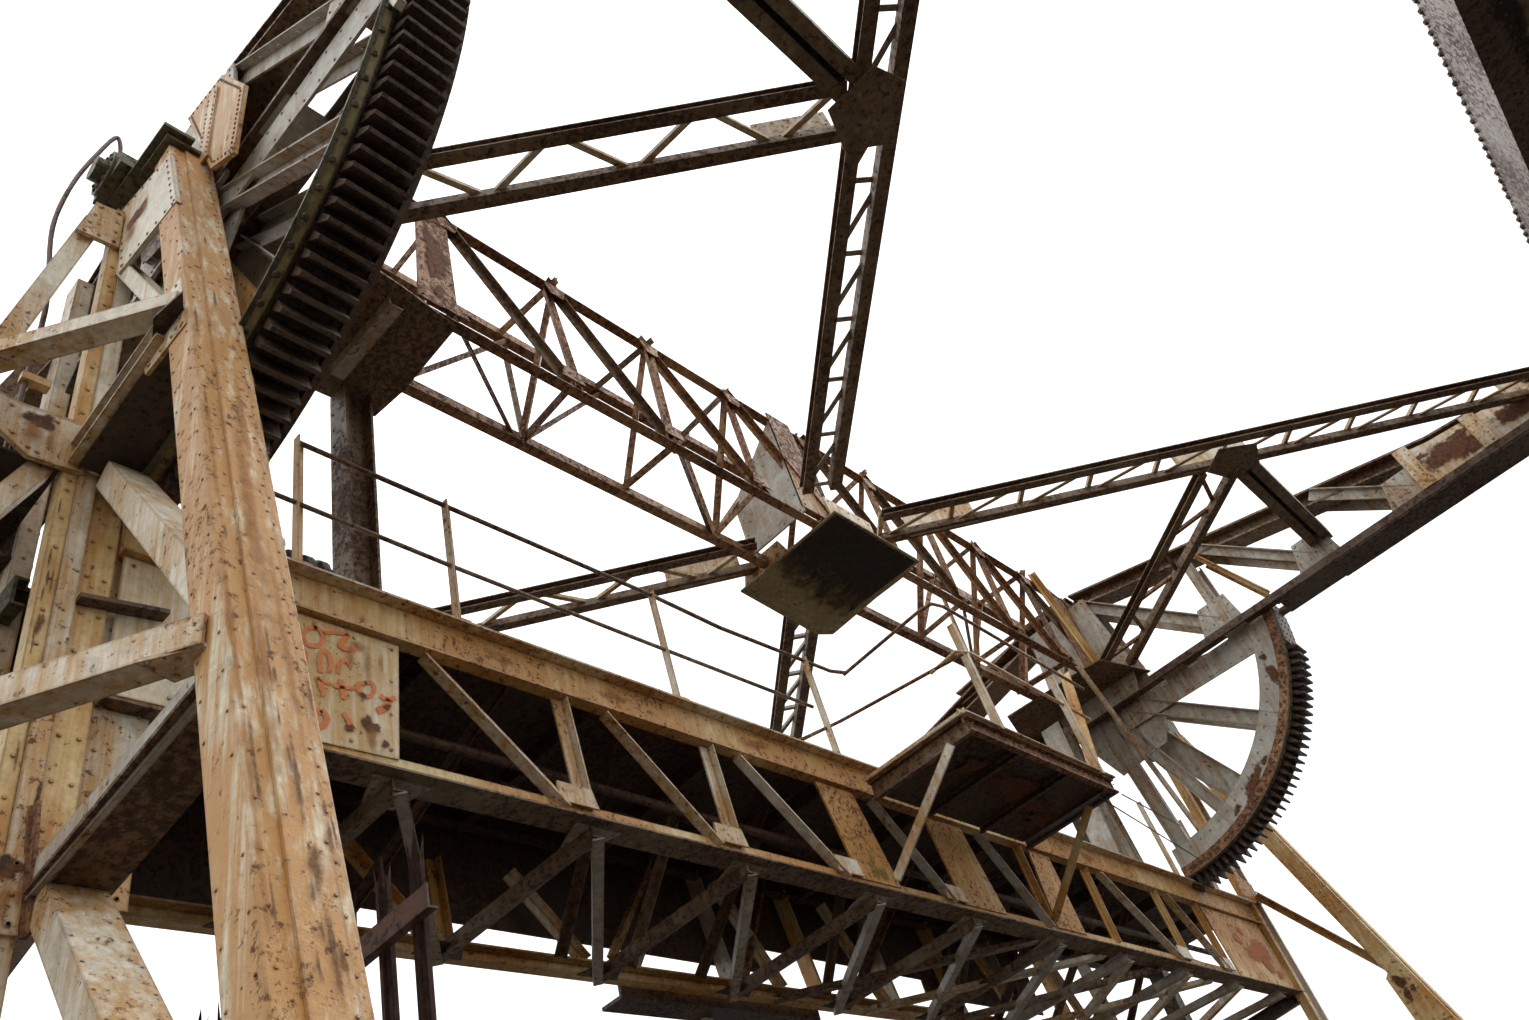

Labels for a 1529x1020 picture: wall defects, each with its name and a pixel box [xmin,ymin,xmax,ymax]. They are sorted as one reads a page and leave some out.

corrosion [422,218,446,299]
corrosion [1489,395,1529,425]
corrosion [1414,427,1482,481]
corrosion [1259,653,1279,685]
corrosion [345,704,391,747]
corrosion [1234,756,1267,816]